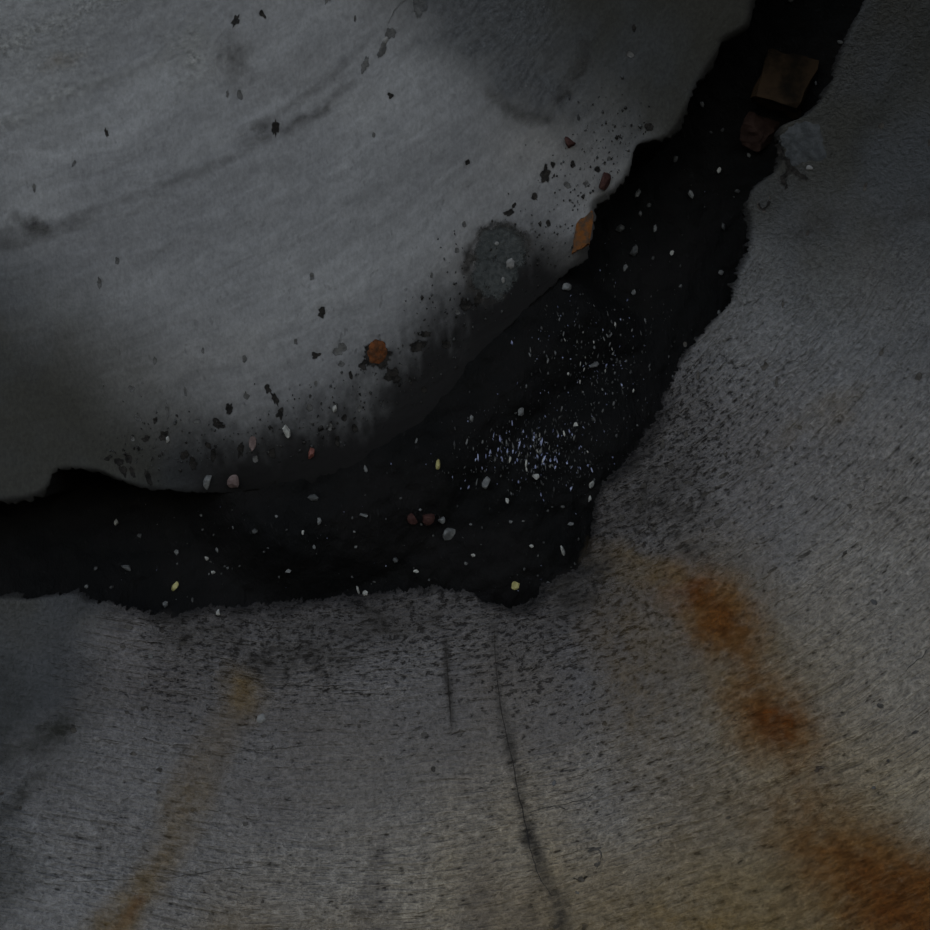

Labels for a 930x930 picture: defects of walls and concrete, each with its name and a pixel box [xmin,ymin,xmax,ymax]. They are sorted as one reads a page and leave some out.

spalling [361,28,396,74]
spalling [540,162,555,183]
spalling [774,121,827,190]
spalling [455,203,529,300]
spalling [333,339,401,383]
spalling [213,403,233,429]
spalling [264,384,283,420]
corrosion [686,578,746,648]
crack [494,632,602,924]